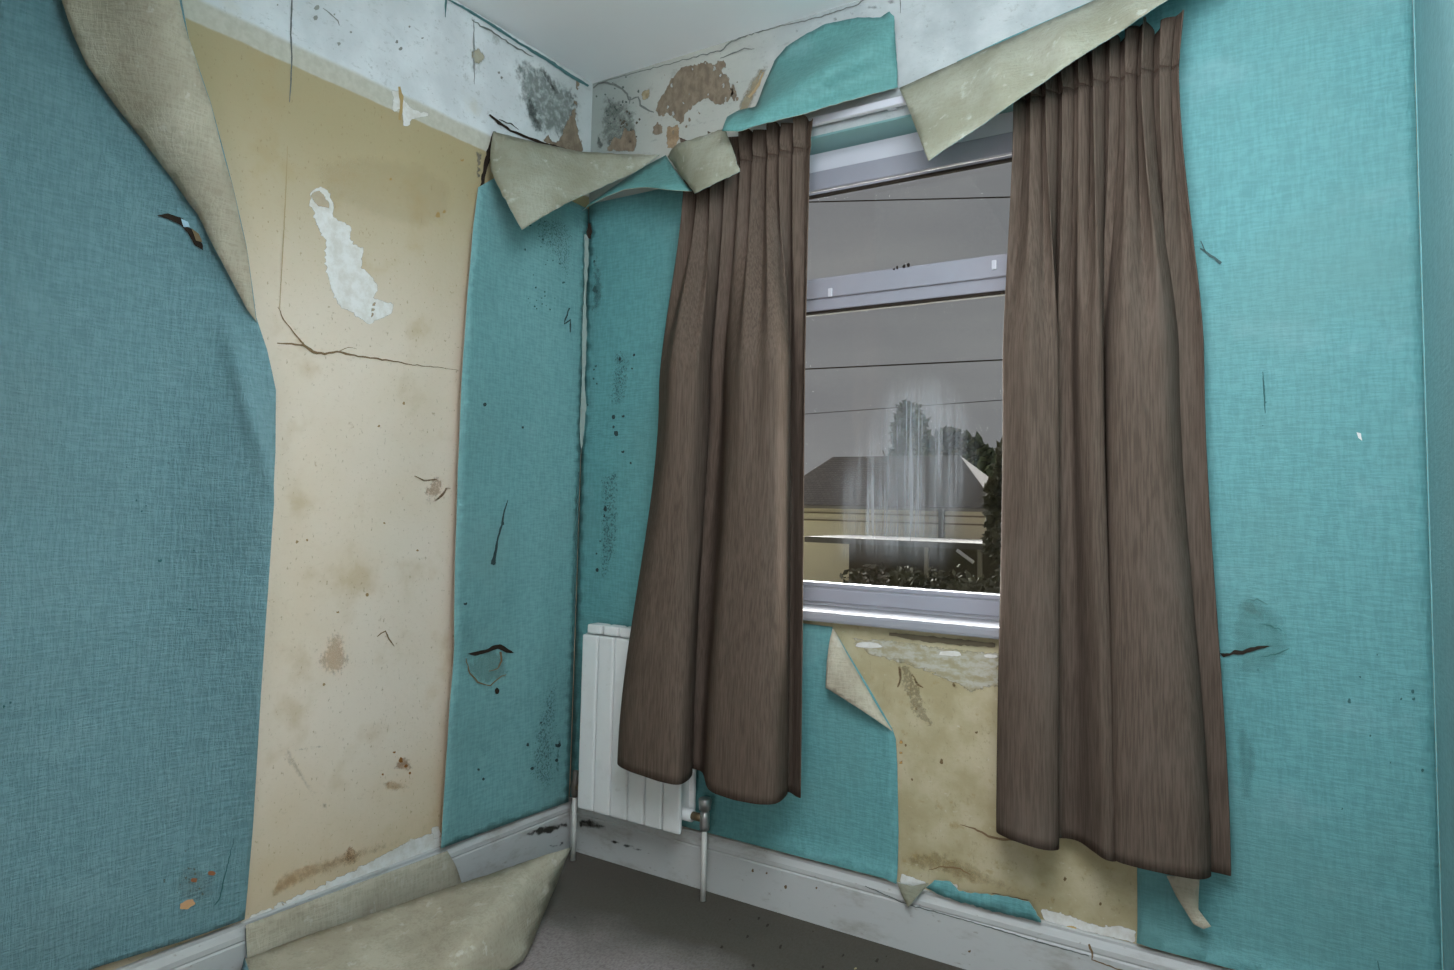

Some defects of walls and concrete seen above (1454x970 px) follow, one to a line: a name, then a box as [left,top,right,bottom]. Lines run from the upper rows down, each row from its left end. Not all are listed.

leakage [519,66,572,132]
flaking render [607,60,739,152]
peeling [309,186,393,324]
crack [277,146,455,370]
flaking render [250,826,441,918]
flaking render [900,874,926,886]
flaking render [1041,909,1136,943]